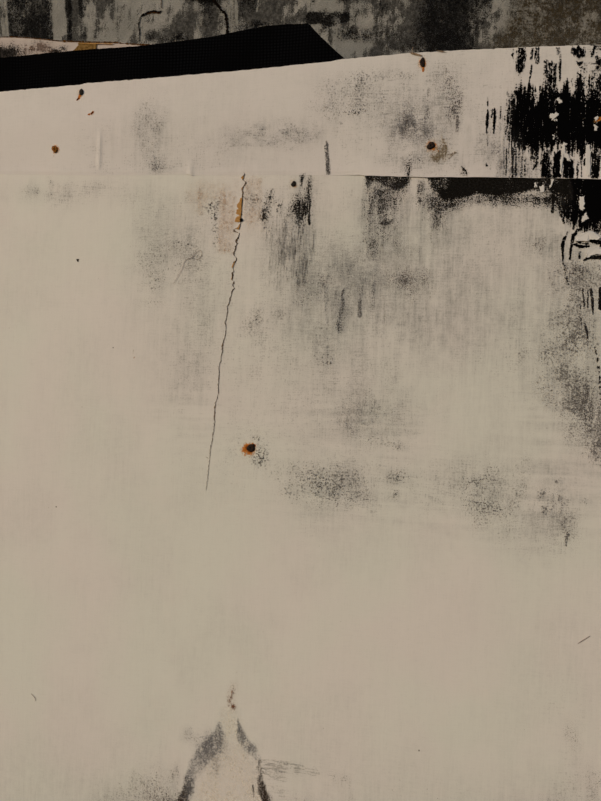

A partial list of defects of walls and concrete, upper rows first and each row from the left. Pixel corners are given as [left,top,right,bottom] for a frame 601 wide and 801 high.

rust [426,138,457,164]
peeling [485,45,601,285]
crack [206,173,246,487]
peeling [579,287,601,339]
leakage [128,722,225,801]
leakage [237,721,272,801]